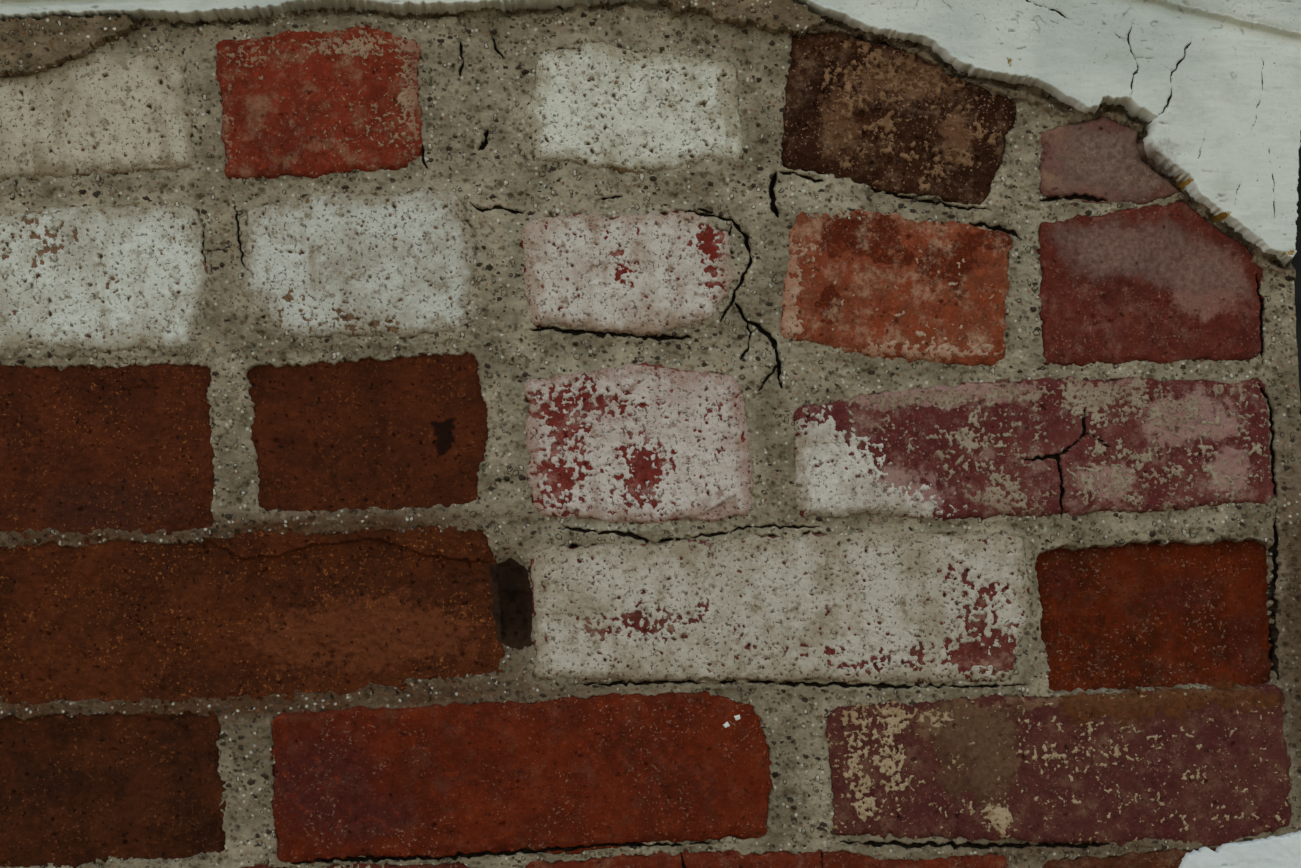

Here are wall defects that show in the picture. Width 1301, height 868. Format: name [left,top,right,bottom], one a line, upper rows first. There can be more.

peeling [0,14,195,181]
peeling [219,29,422,174]
peeling [525,41,744,173]
flaking render [661,0,825,38]
peeling [821,40,1003,194]
crack [1116,29,1191,124]
peeling [0,203,209,353]
peeling [241,189,476,338]
peeling [520,210,734,337]
crack [684,208,782,391]
crack [1023,410,1110,515]
peeling [488,364,1291,844]